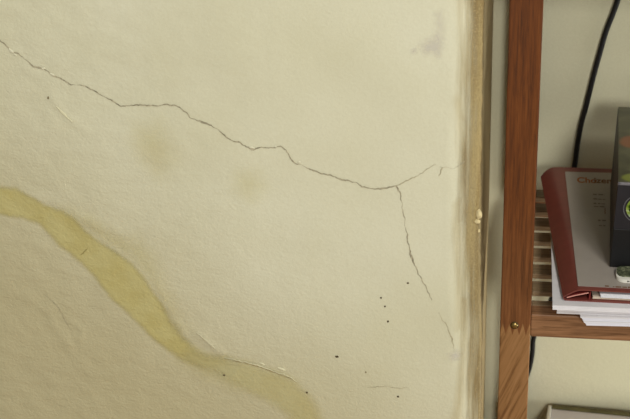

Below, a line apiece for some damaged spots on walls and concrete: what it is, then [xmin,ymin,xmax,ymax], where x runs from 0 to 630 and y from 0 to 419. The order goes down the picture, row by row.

crack [0,41,465,300]
leakage [0,188,315,419]